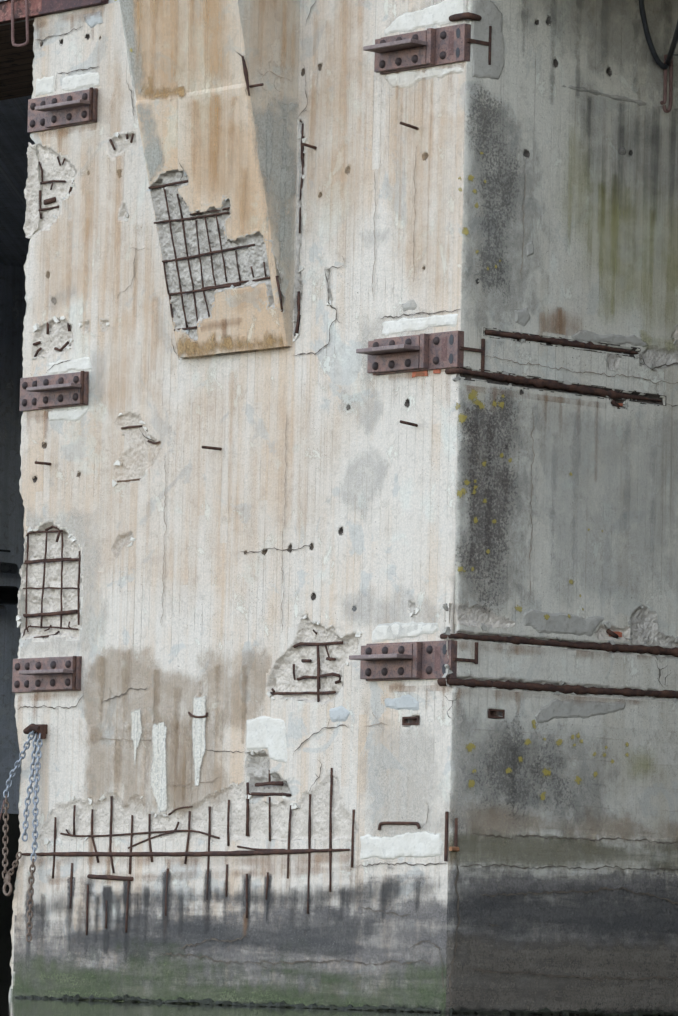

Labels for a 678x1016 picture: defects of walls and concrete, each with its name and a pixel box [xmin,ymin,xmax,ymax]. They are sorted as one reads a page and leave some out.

corrosion [140,77,185,100]
corrosion [241,56,250,96]
spalling [146,116,308,358]
crack [295,256,344,356]
spalling [16,521,82,642]
damp [131,710,167,813]
damp [182,696,206,795]
corrosion [22,806,350,862]
spalling [36,749,359,933]
crack [473,832,678,844]
damp [12,870,678,1016]
crack [162,860,678,1007]